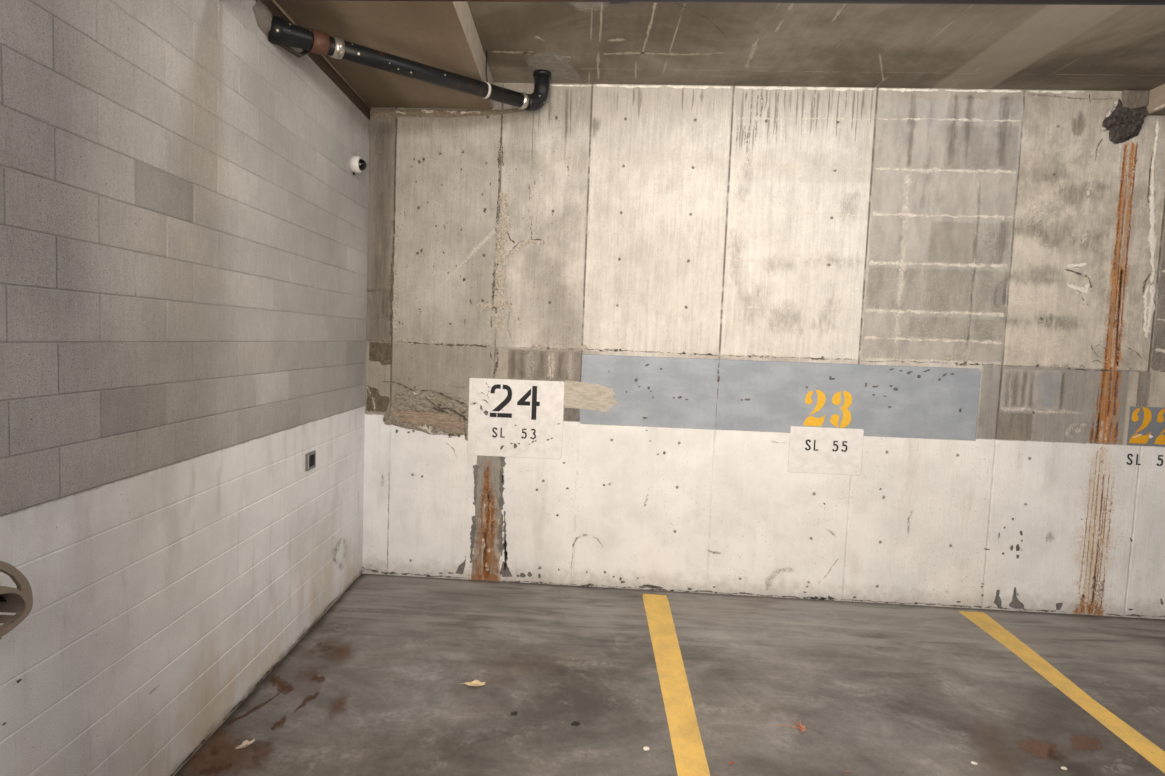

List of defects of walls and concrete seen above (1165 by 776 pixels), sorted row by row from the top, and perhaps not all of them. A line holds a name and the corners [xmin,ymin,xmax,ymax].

spalling [1095,90,1150,161]
crack [367,118,1165,440]
flaking render [383,388,469,441]
rust [1069,142,1138,616]
rust [467,460,506,582]